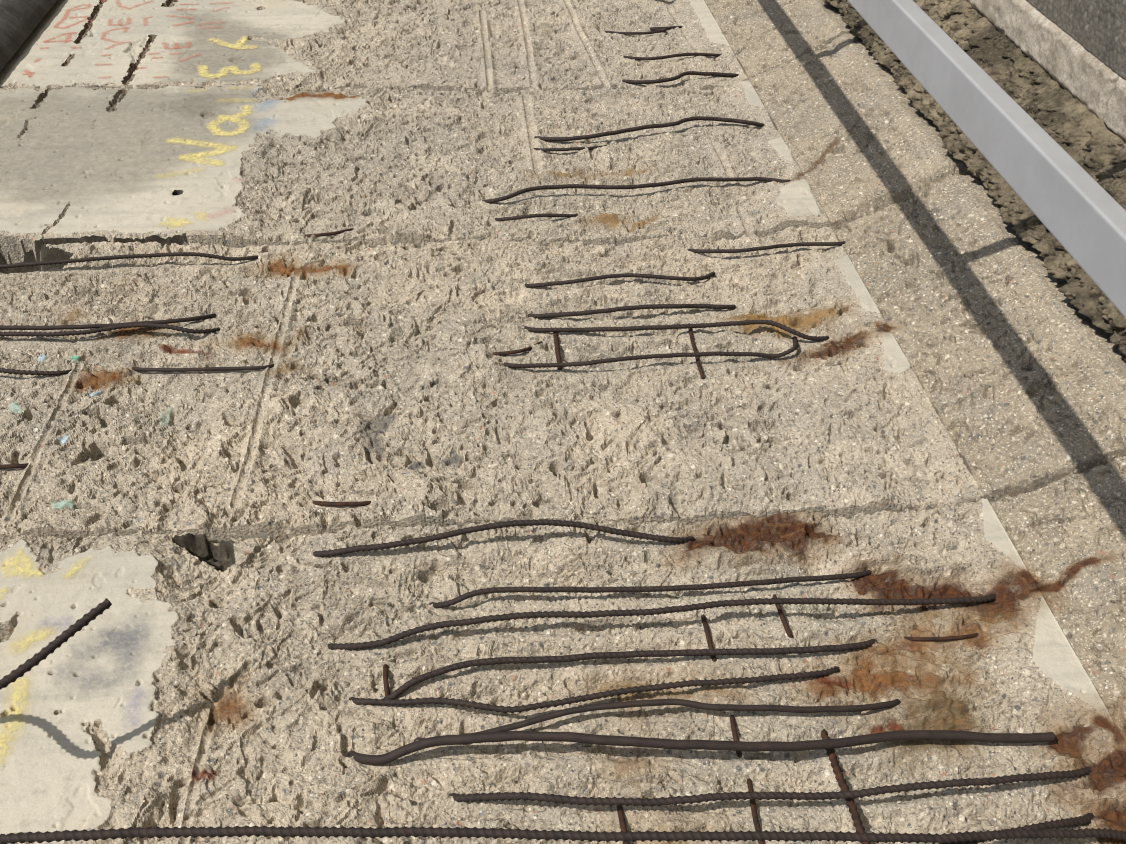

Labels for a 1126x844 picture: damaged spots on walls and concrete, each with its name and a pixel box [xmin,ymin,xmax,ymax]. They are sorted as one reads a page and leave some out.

spalling [0,0,984,546]
rust [731,308,837,338]
rust [801,324,893,359]
rust [684,512,837,561]
spalling [0,499,1126,844]
rust [808,557,1106,752]
rust [1048,716,1126,844]